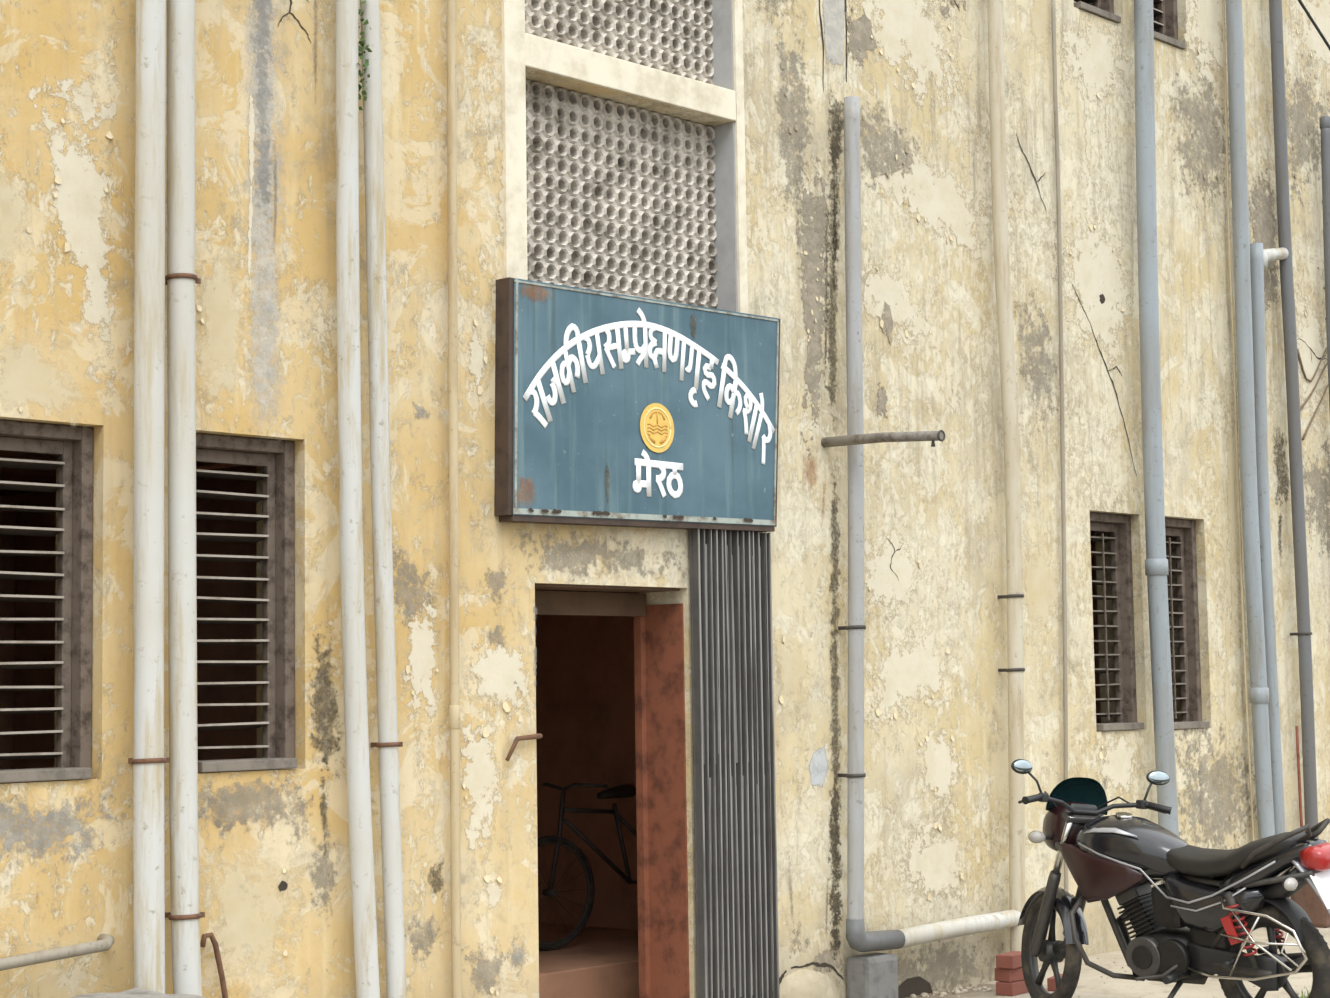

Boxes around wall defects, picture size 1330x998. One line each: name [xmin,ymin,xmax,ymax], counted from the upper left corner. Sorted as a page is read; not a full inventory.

crack [278,0,311,42]
peeling [27,78,117,393]
leakage [247,0,281,413]
leakage [824,91,844,419]
leakage [860,108,920,188]
leakage [0,796,111,867]
leakage [198,634,340,911]
peeling [402,587,441,728]
peeling [461,634,533,850]
leakage [826,477,844,971]
leakage [890,937,994,991]